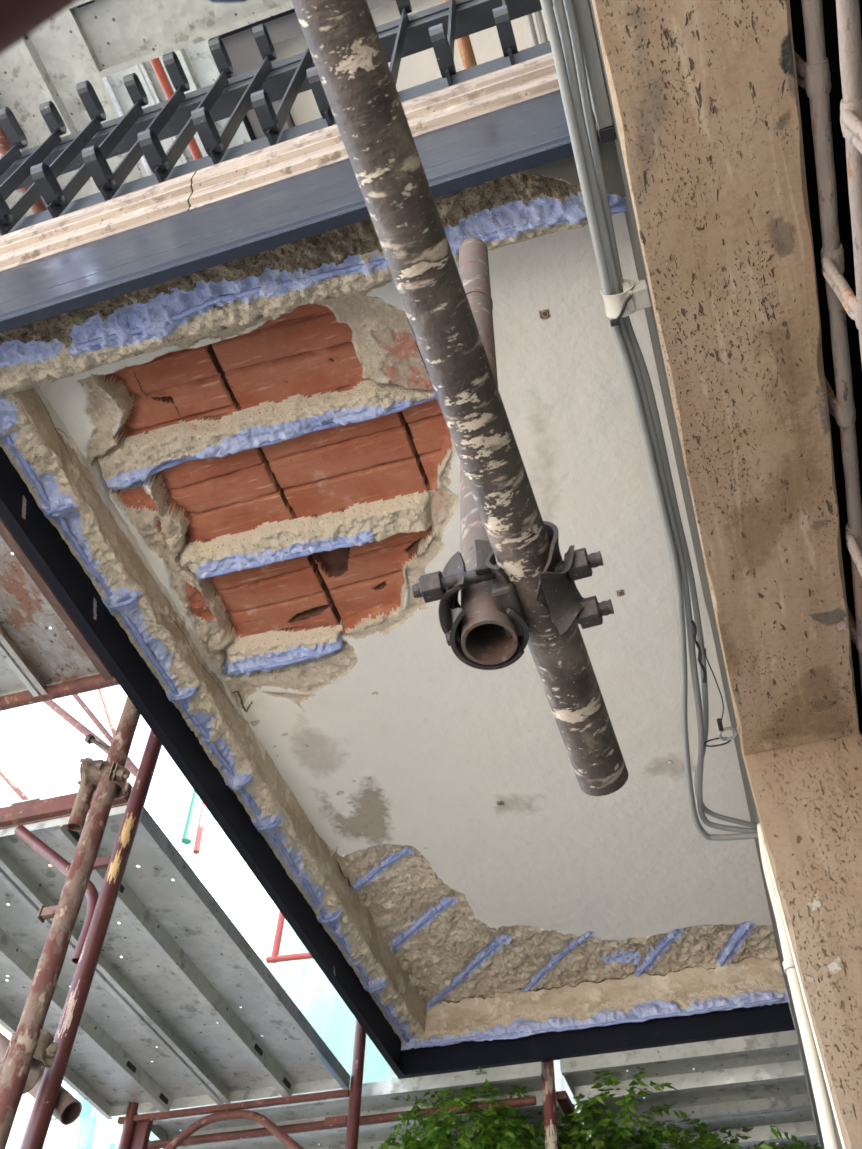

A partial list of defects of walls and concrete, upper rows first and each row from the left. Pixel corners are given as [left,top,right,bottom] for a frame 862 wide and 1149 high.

spalling [435,172,582,229]
spalling [0,218,787,1049]
damp [330,789,387,841]